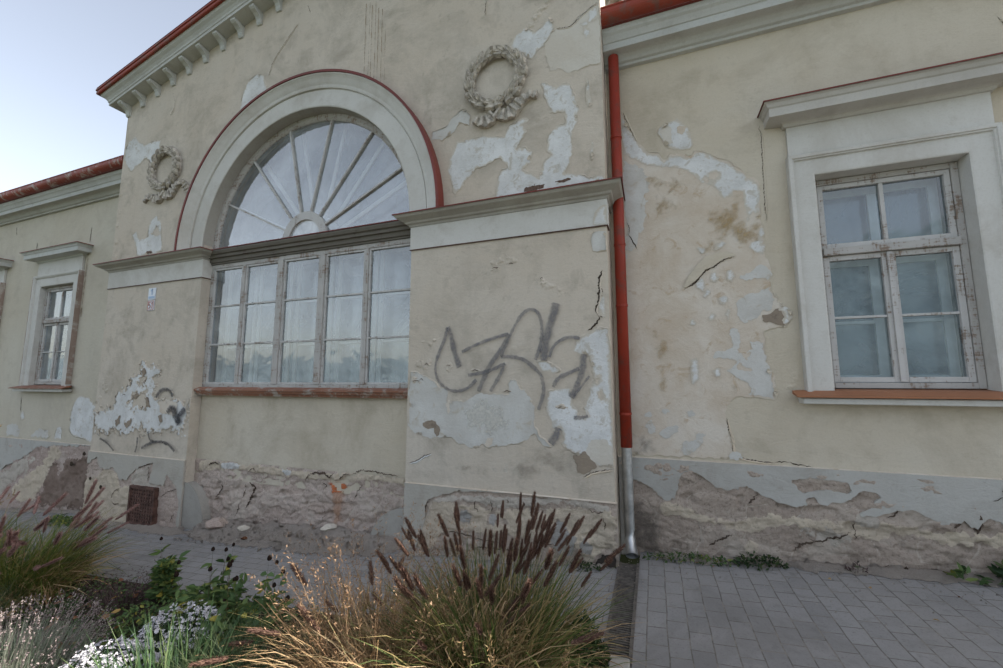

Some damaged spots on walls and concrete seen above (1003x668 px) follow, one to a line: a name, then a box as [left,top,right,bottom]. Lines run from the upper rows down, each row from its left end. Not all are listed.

peeling [447,5,605,197]
peeling [124,136,161,172]
peeling [132,215,163,257]
peeling [590,205,608,253]
crack [687,256,734,288]
peeling [620,110,1003,574]
peeling [408,297,622,475]
spalling [0,360,191,528]
spalling [416,490,619,568]